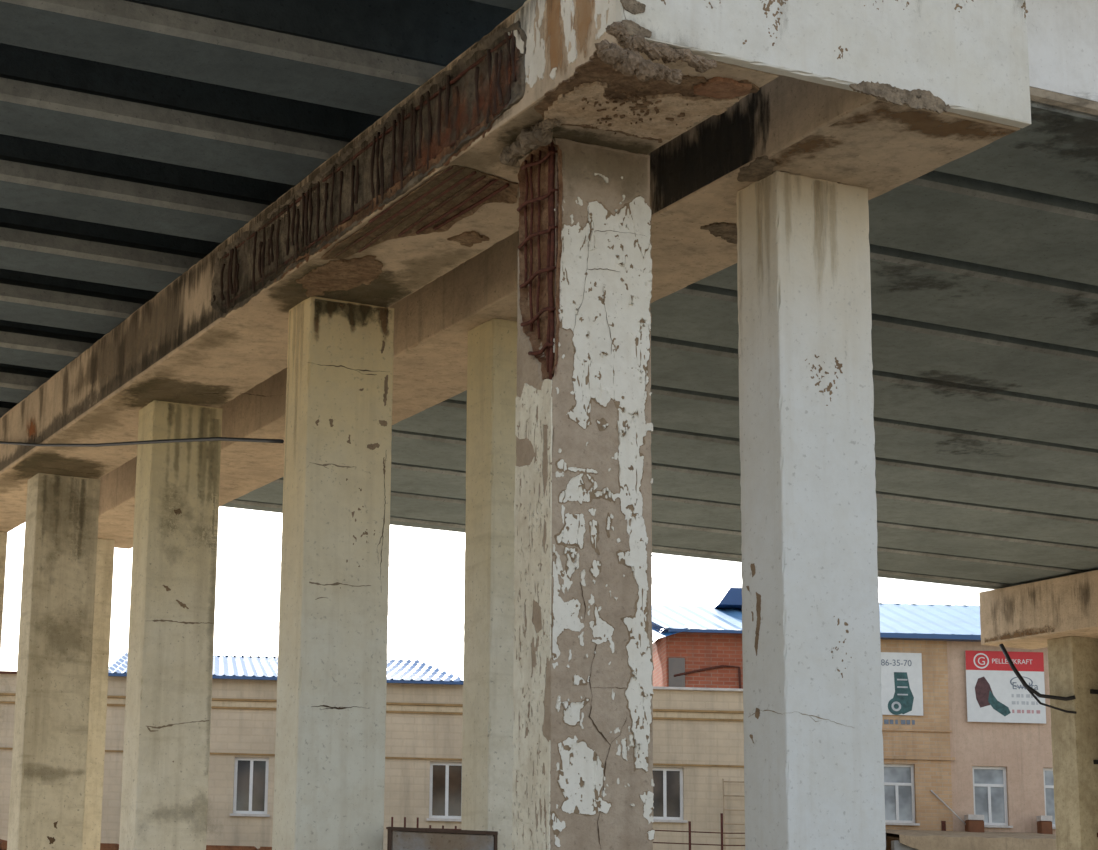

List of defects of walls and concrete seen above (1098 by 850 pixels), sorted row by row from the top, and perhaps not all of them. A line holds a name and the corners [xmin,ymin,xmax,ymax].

peeling [760,0,788,46]
water stain [552,87,769,214]
spalling [737,156,777,182]
water stain [272,267,411,335]
water stain [124,377,229,407]
peeling [210,0,761,850]
water stain [14,454,104,478]
crack [309,460,386,600]
crack [147,720,209,732]
crack [312,703,369,711]
crack [580,582,627,847]
crack [749,710,850,727]